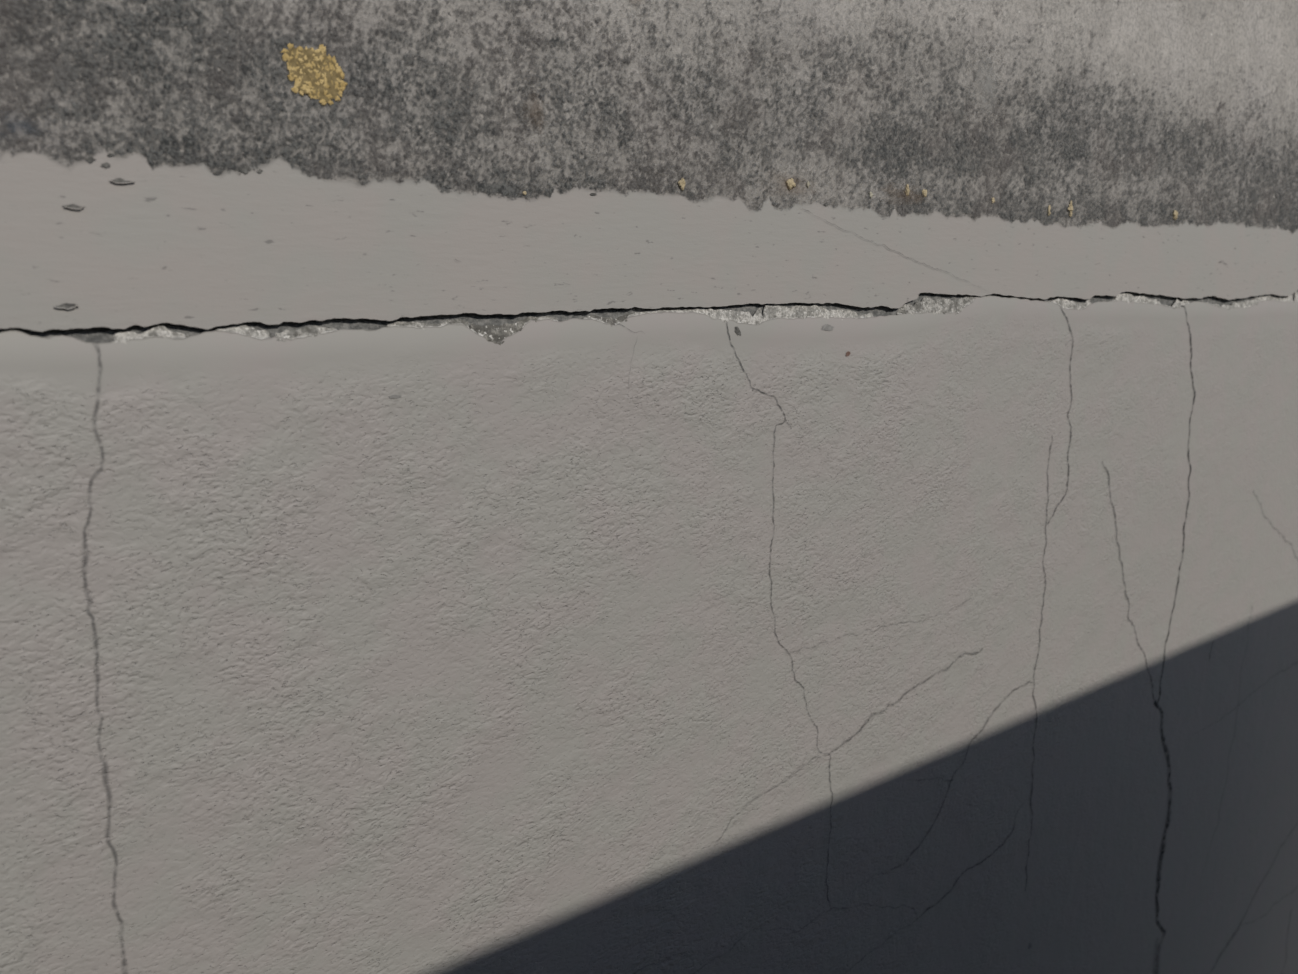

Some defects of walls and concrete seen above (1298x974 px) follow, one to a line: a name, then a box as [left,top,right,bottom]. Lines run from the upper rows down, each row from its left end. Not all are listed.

peeling [85,153,135,184]
damp [672,0,1298,232]
crack [0,248,1298,933]